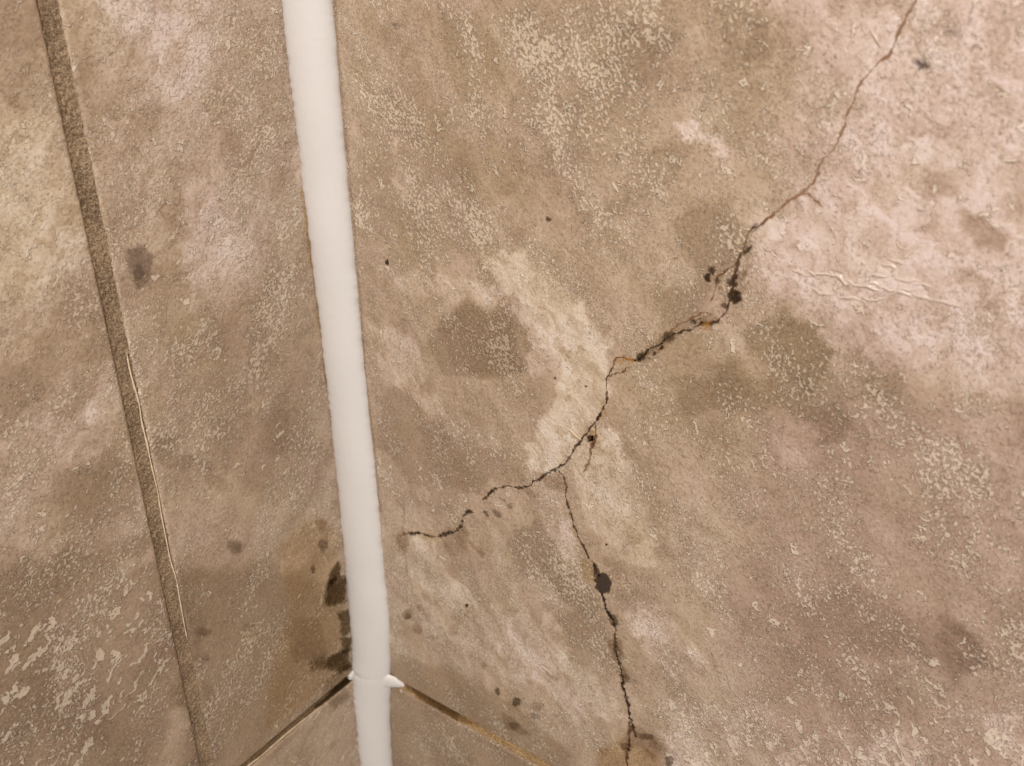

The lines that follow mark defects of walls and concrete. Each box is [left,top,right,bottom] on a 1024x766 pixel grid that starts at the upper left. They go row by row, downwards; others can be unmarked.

crack [400,0,917,766]
damp [325,561,346,606]
damp [315,637,352,707]